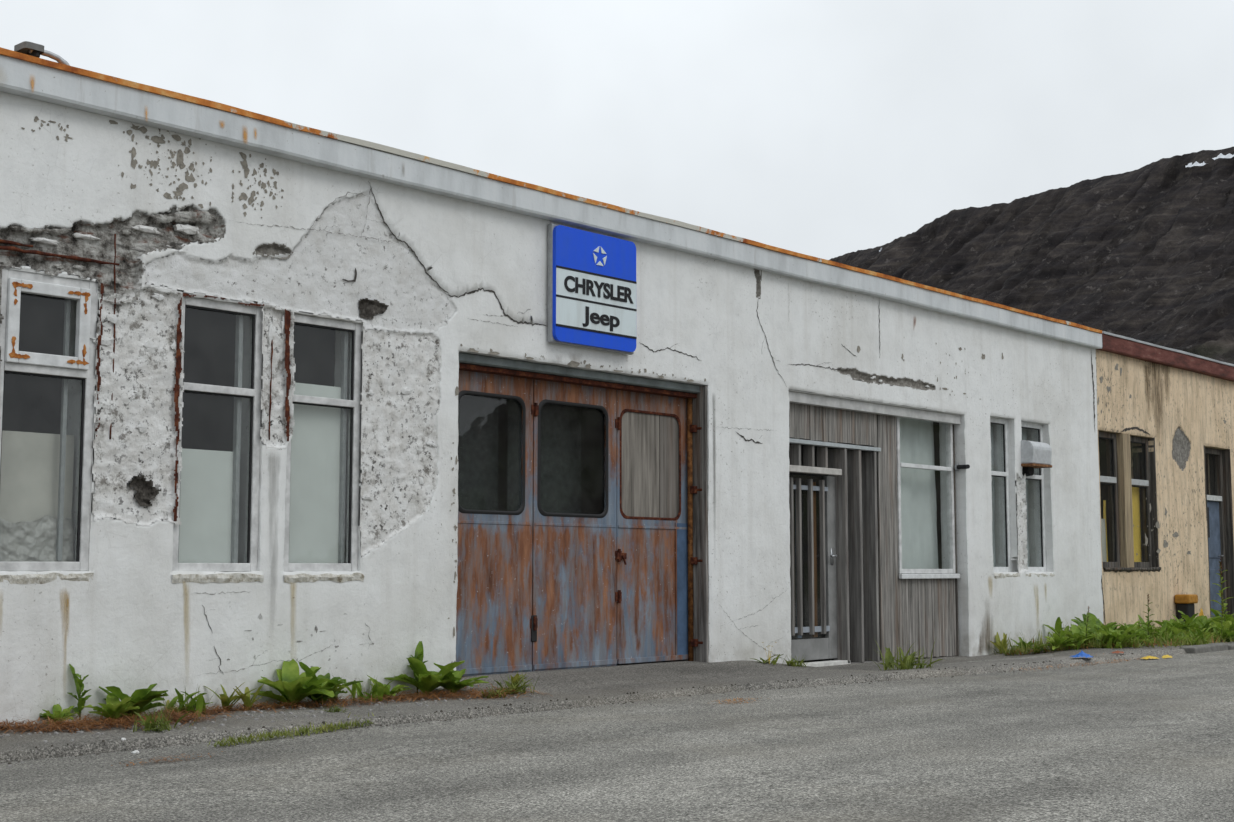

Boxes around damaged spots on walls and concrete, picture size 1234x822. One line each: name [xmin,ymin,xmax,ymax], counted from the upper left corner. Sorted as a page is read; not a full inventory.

peeling [21,116,72,142]
crack [240,179,548,327]
rust [173,293,264,521]
spalling [0,120,459,557]
crack [756,297,880,387]
spalling [832,343,981,400]
damp [1145,363,1168,420]
spalling [1172,427,1191,471]